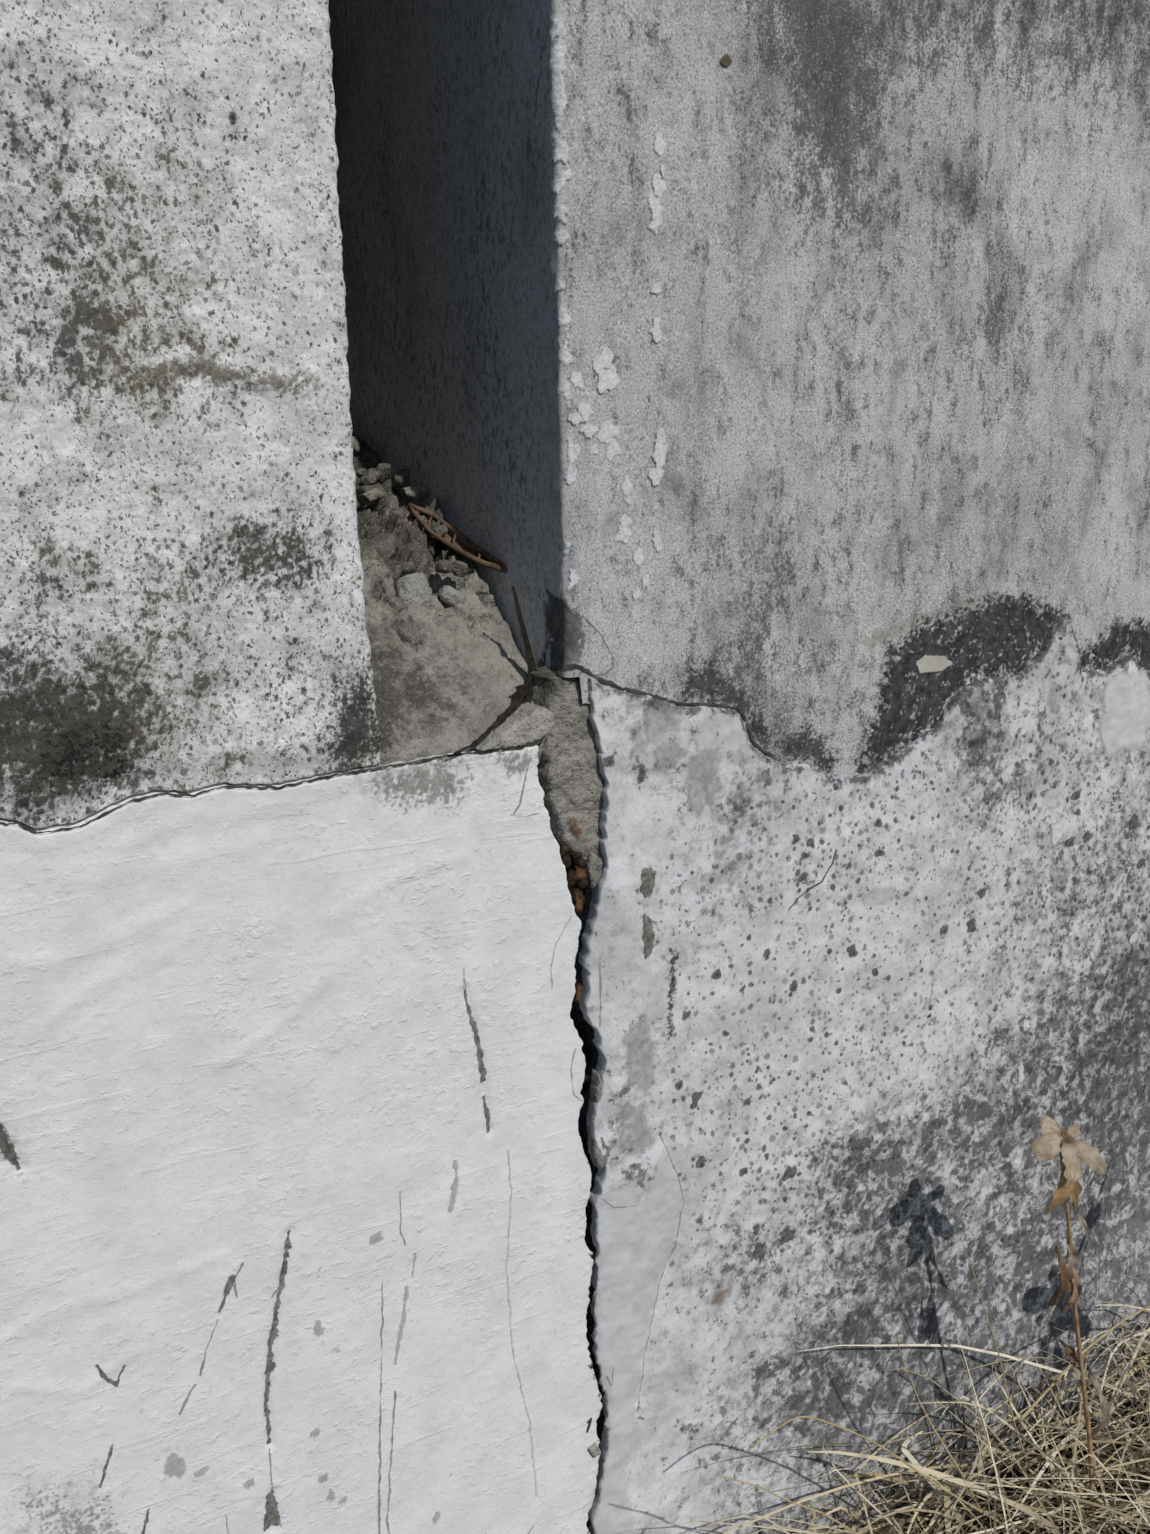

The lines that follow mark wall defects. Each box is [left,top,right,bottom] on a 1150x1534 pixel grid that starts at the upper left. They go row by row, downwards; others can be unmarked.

peeling [549,15,572,244]
peeling [648,133,667,234]
peeling [553,279,622,485]
peeling [649,427,669,486]
leakage [0,626,172,830]
crack [0,586,782,834]
spalling [474,539,615,862]
peeling [632,705,720,815]
leakage [682,590,1150,778]
crack [551,851,632,1250]
crack [506,1150,537,1495]
crack [586,1286,614,1458]